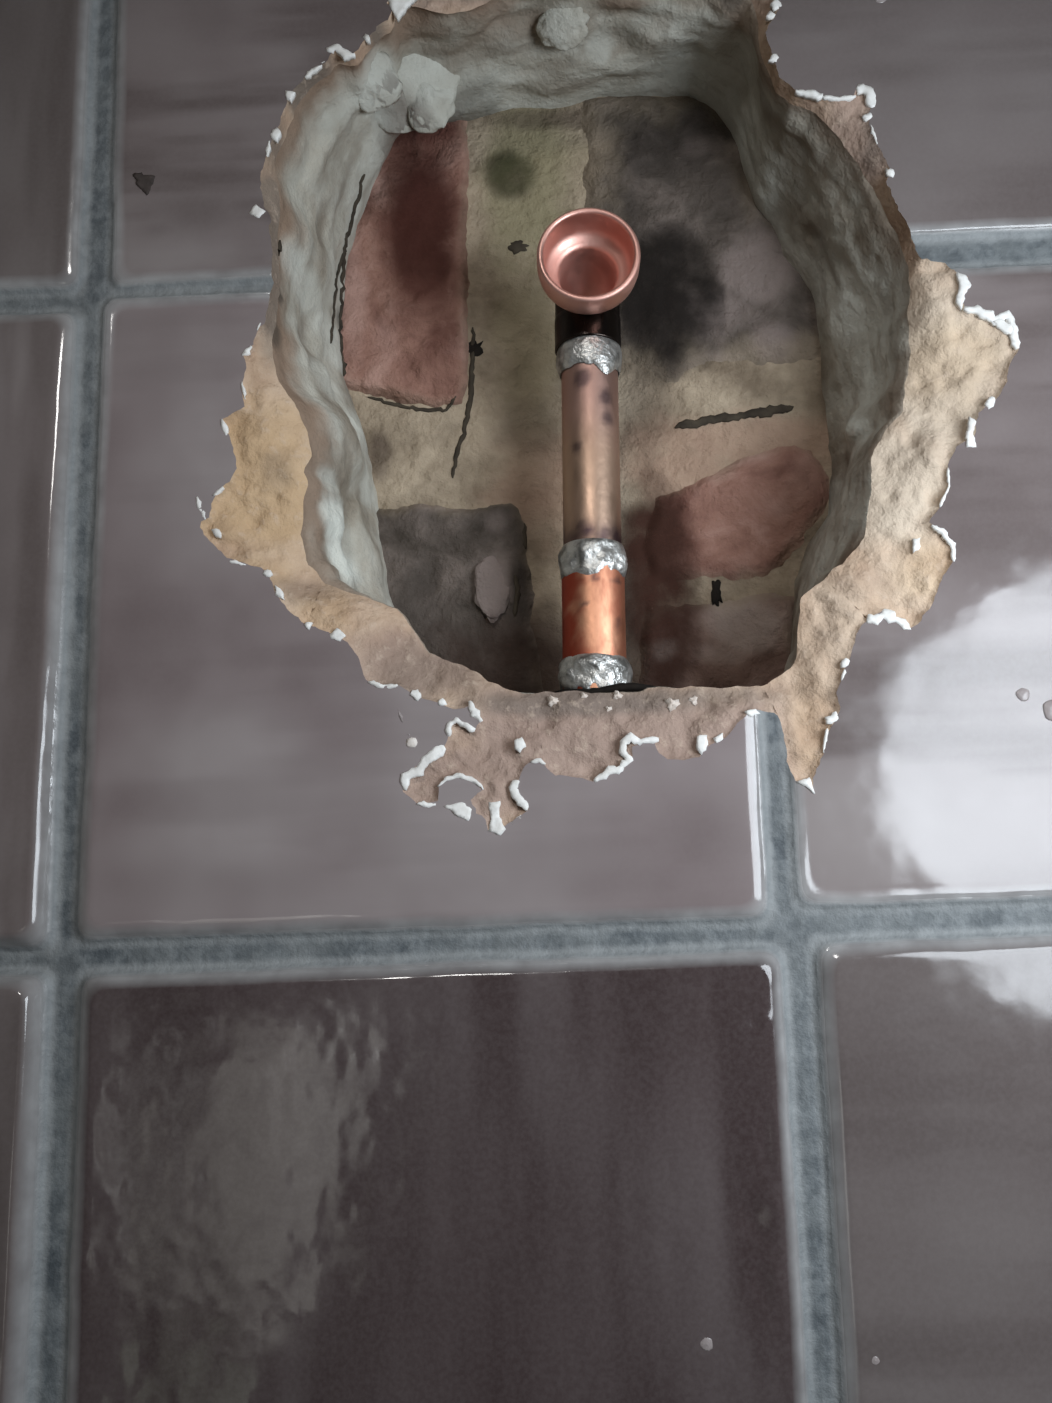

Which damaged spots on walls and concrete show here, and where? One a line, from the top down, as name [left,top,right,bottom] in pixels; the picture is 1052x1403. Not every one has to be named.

crack [330,174,476,478]
spalling [196,0,1021,835]
crack [674,404,794,429]